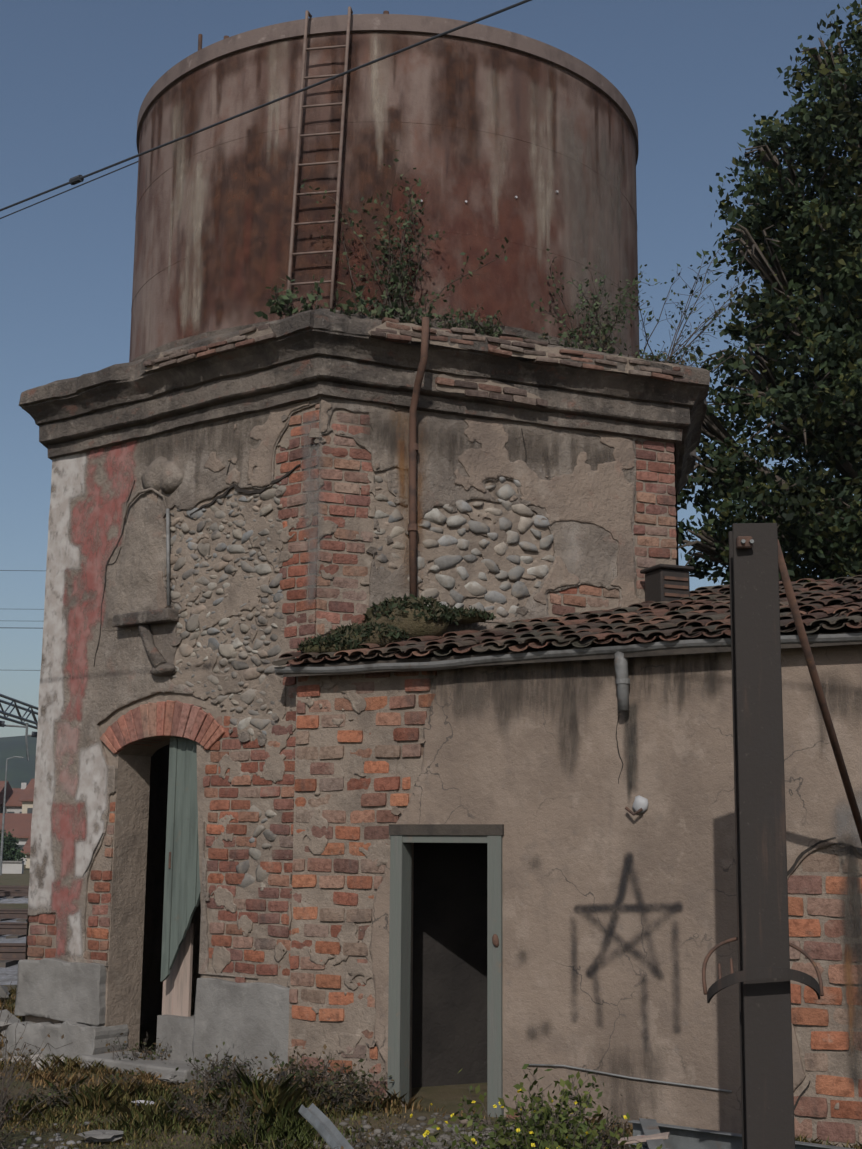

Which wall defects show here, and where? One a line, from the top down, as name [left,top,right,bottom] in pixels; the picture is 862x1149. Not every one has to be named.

rust [138,78,198,224]
rust [195,41,402,325]
rust [436,42,536,156]
rust [551,73,566,153]
crack [190,461,300,516]
water stain [504,438,616,476]
spalling [156,399,677,1100]
water stain [430,661,602,758]
water stain [625,704,637,793]
spalling [787,843,862,1148]